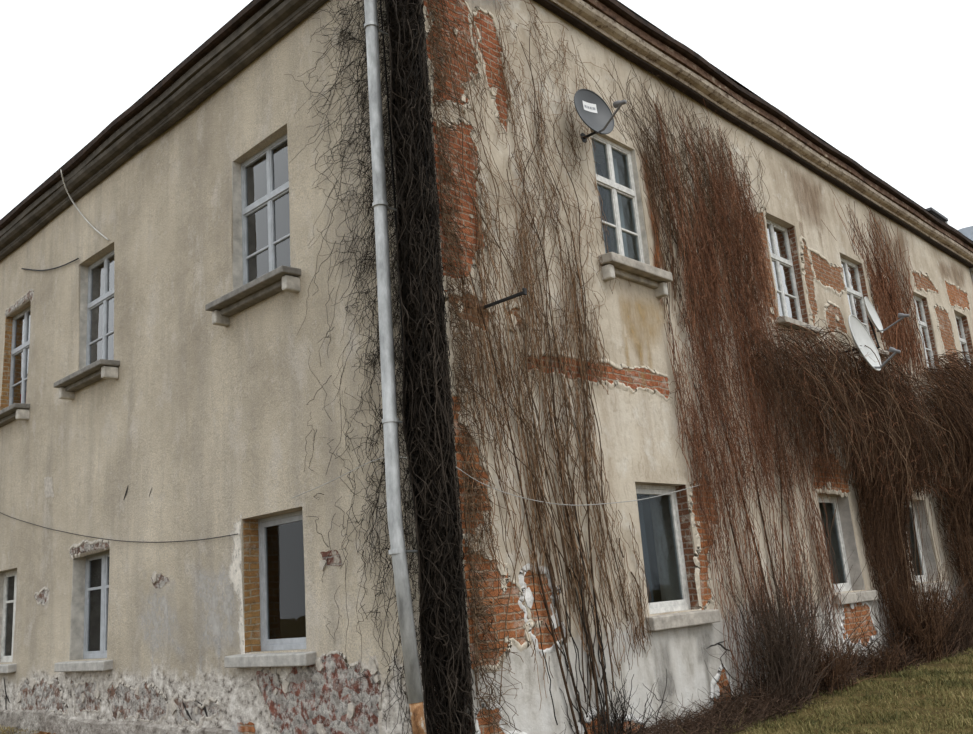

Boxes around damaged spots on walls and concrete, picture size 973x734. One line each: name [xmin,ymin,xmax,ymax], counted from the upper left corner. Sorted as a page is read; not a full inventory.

flaking render [423,0,529,336]
flaking render [799,235,848,340]
flaking render [864,259,911,368]
flaking render [910,269,970,368]
flaking render [523,348,670,402]
flaking render [418,386,565,734]
flaking render [839,593,879,650]
flaking render [17,676,222,729]
flaking render [237,721,255,734]
flaking render [254,650,385,734]